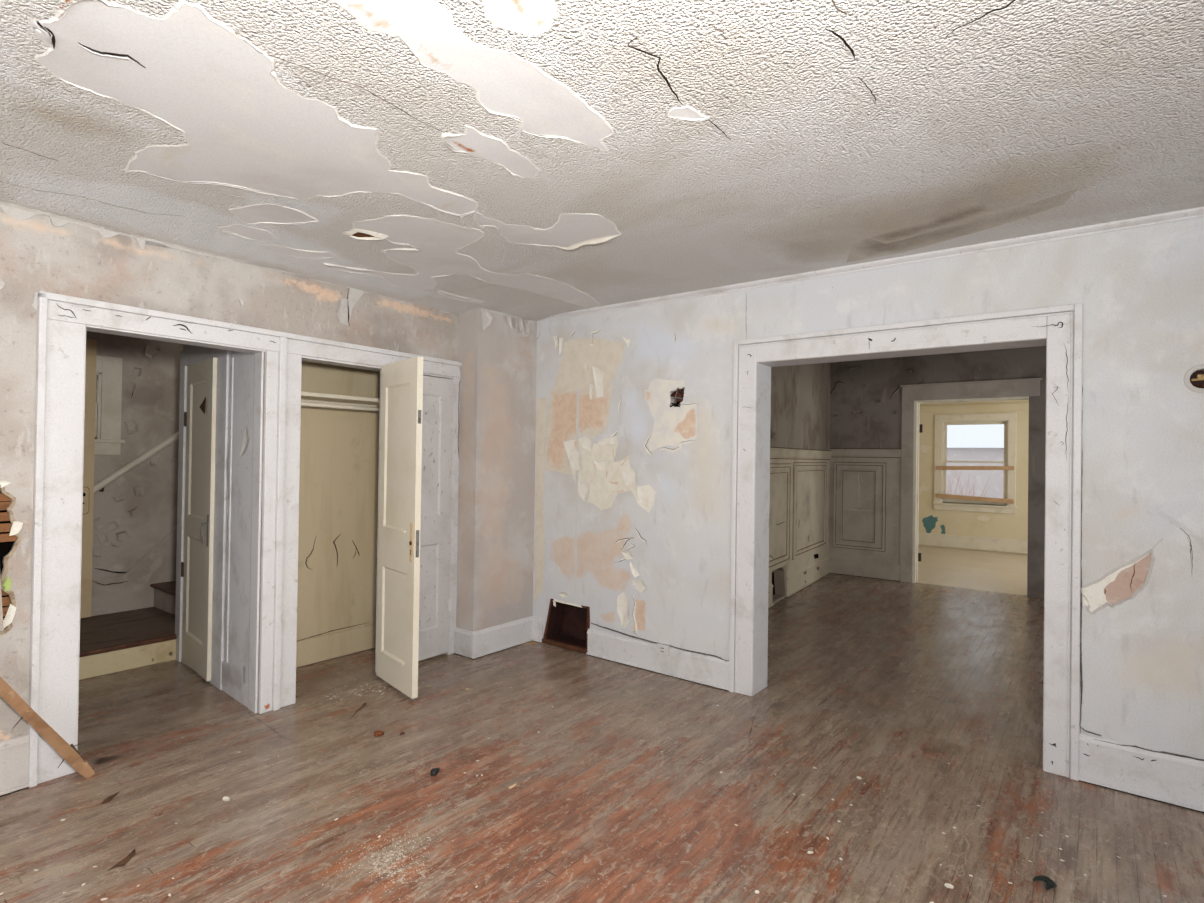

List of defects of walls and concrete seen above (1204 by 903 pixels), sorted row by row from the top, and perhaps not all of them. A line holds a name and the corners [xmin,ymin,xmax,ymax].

crack [624,35,731,140]
crack [823,0,876,104]
crack [946,0,1029,37]
peeling [0,0,622,338]
flaking render [644,377,697,456]
peeling [563,434,656,514]
spalling [0,481,23,635]
peeling [617,550,647,628]
peeling [1081,538,1165,615]